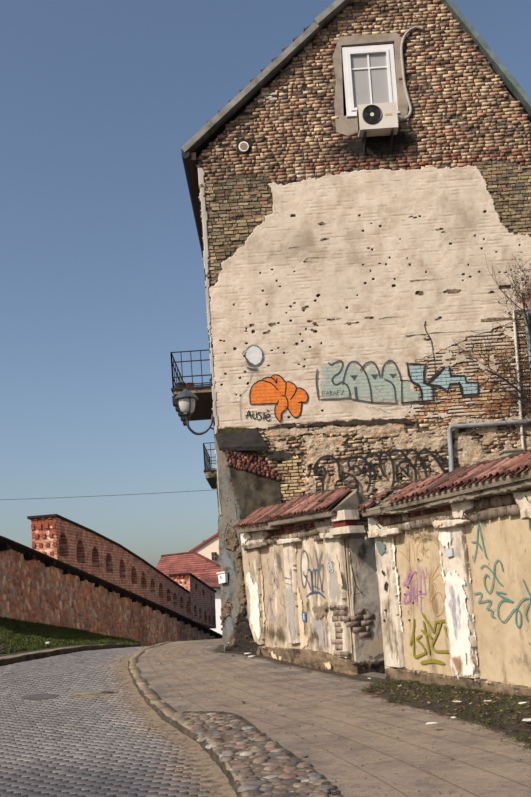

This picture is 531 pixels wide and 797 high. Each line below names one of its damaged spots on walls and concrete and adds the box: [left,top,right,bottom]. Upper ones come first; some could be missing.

flaking render [199,173,273,284]
flaking render [472,160,531,235]
flaking render [398,317,531,424]
flaking render [222,441,282,482]
spalling [220,525,281,660]
flaking render [284,554,387,674]
peeling [433,521,478,678]